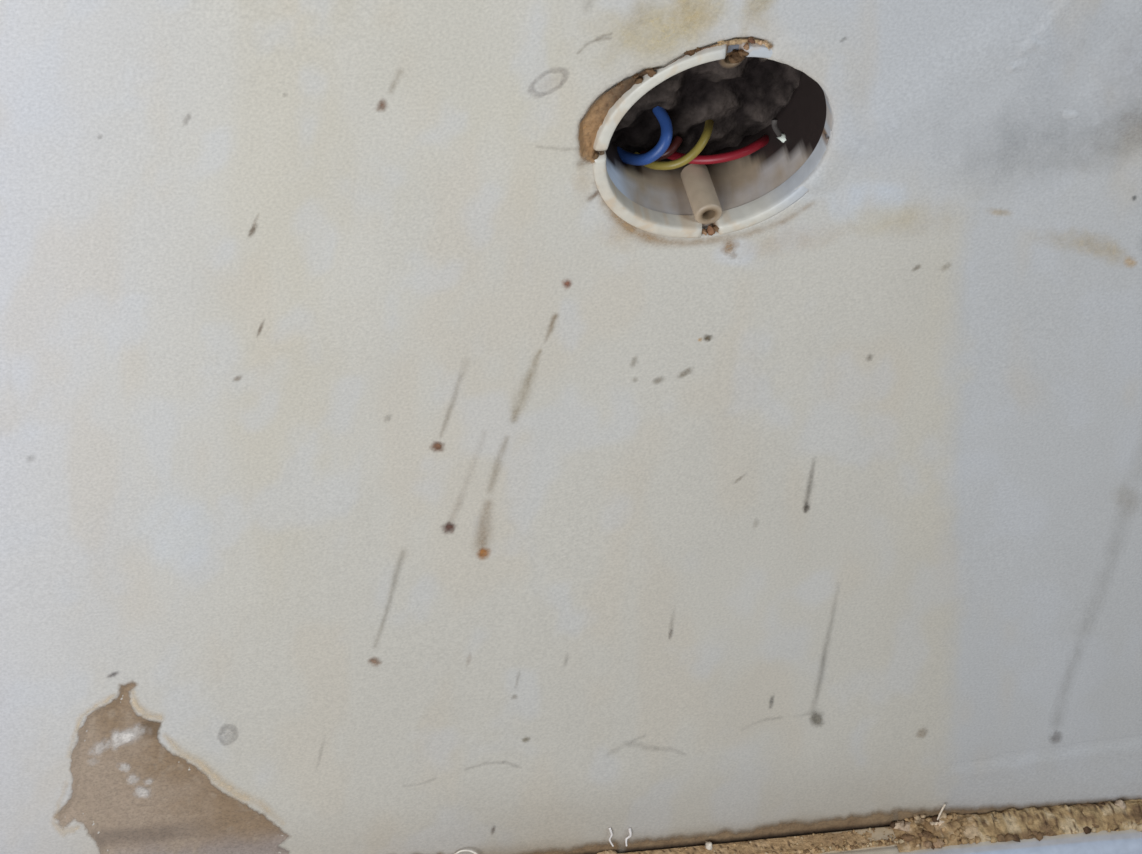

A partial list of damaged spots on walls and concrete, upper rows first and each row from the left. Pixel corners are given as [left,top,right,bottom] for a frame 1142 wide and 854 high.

peeling [55,683,289,854]